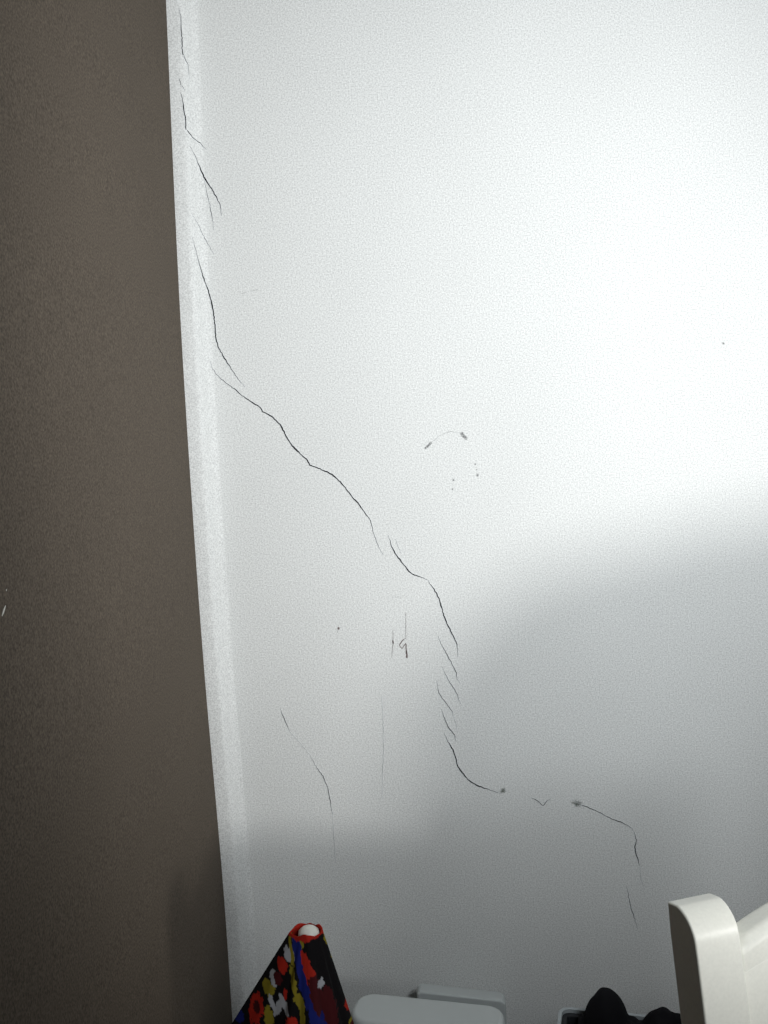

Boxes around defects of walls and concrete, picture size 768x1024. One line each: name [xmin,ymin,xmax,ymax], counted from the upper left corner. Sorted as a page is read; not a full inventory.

crack [179,8,501,799]
crack [280,709,336,863]
crack [531,797,645,929]